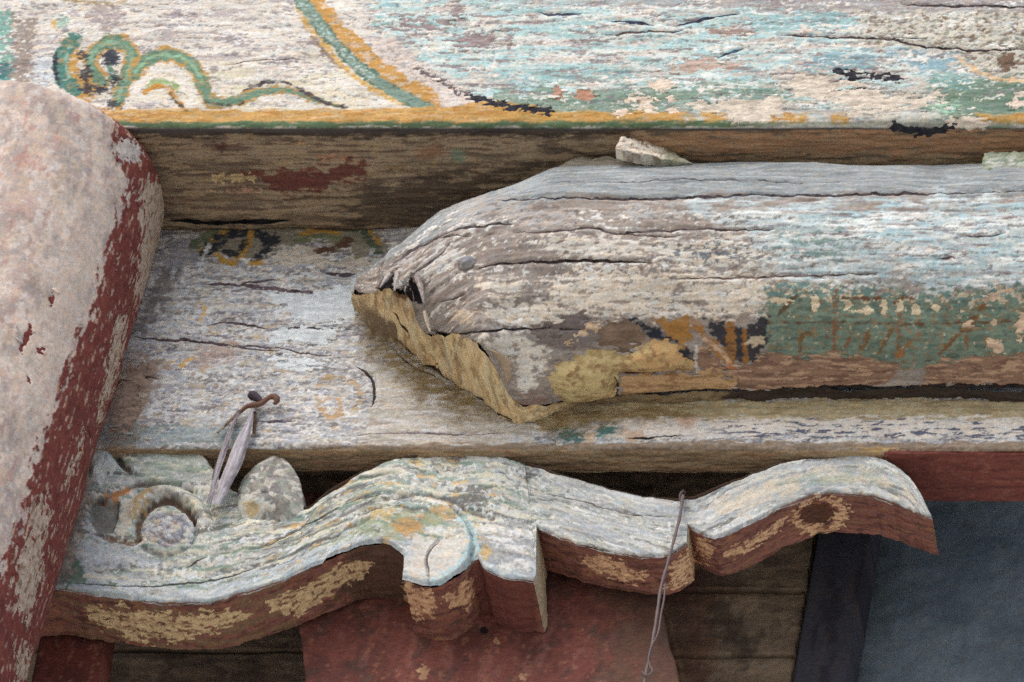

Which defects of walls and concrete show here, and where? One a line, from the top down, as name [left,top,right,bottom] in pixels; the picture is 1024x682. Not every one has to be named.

peeling [368,0,515,54]
peeling [610,54,1024,135]
crack [385,177,1023,274]
peeling [62,134,164,493]
crack [137,322,376,407]
crack [348,312,584,436]
peeling [522,309,905,402]
crack [680,272,876,280]
peeling [5,493,56,682]
peeling [81,560,375,647]
crack [426,536,444,579]
peeling [400,574,478,622]